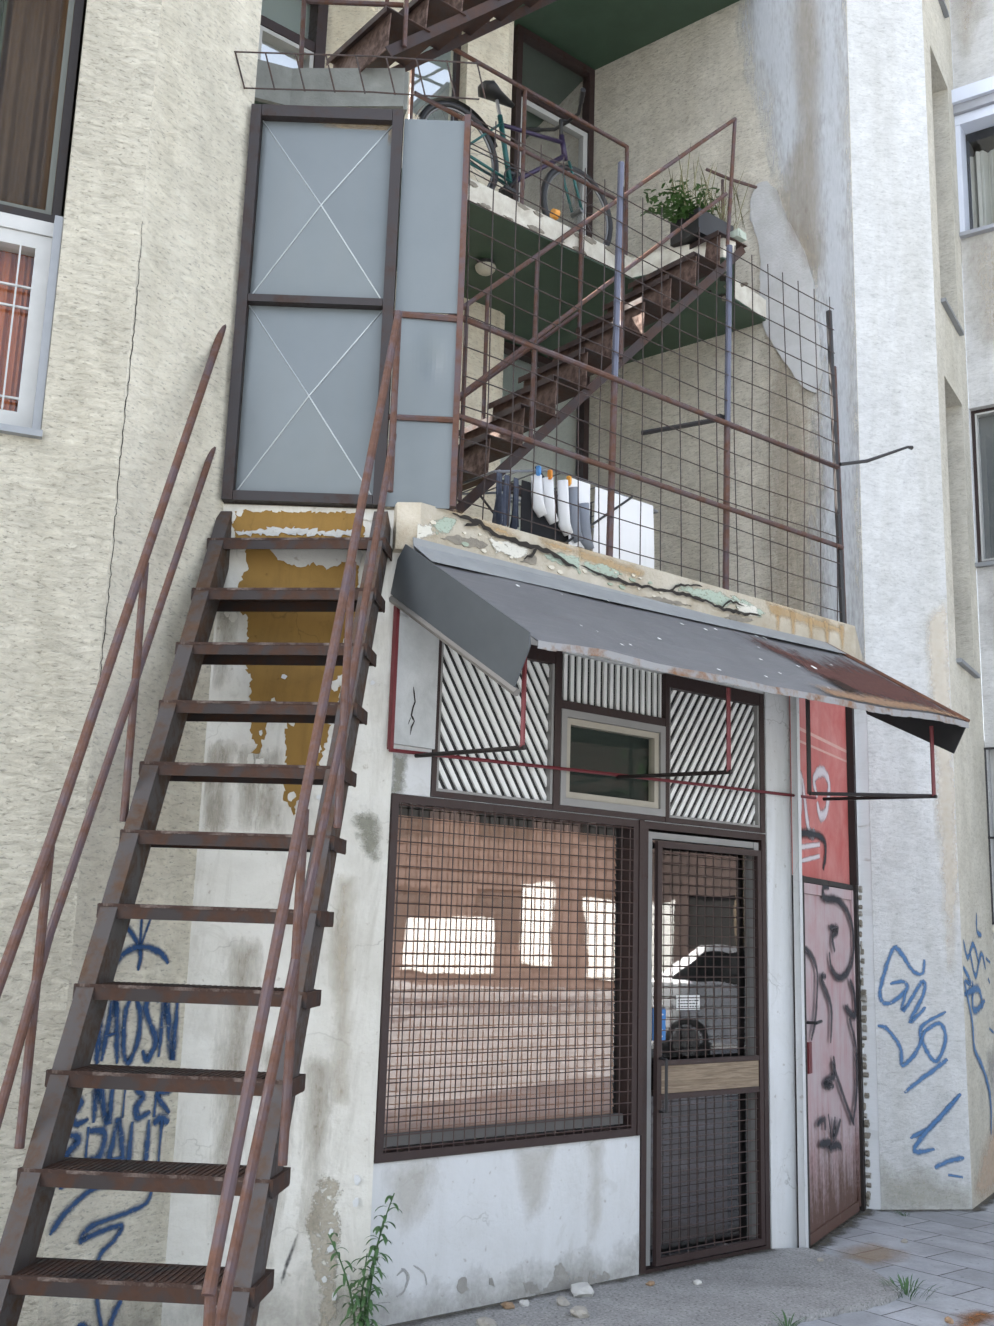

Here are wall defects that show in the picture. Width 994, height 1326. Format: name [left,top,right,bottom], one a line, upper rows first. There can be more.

peeling [231,508,373,588]
peeling [417,517,765,622]
corrosion [547,543,640,575]
peeling [224,612,355,643]
corrosion [749,605,963,719]
peeling [242,665,343,702]
peeling [247,722,331,766]
peeling [283,784,321,816]
corrosion [959,1312,989,1326]